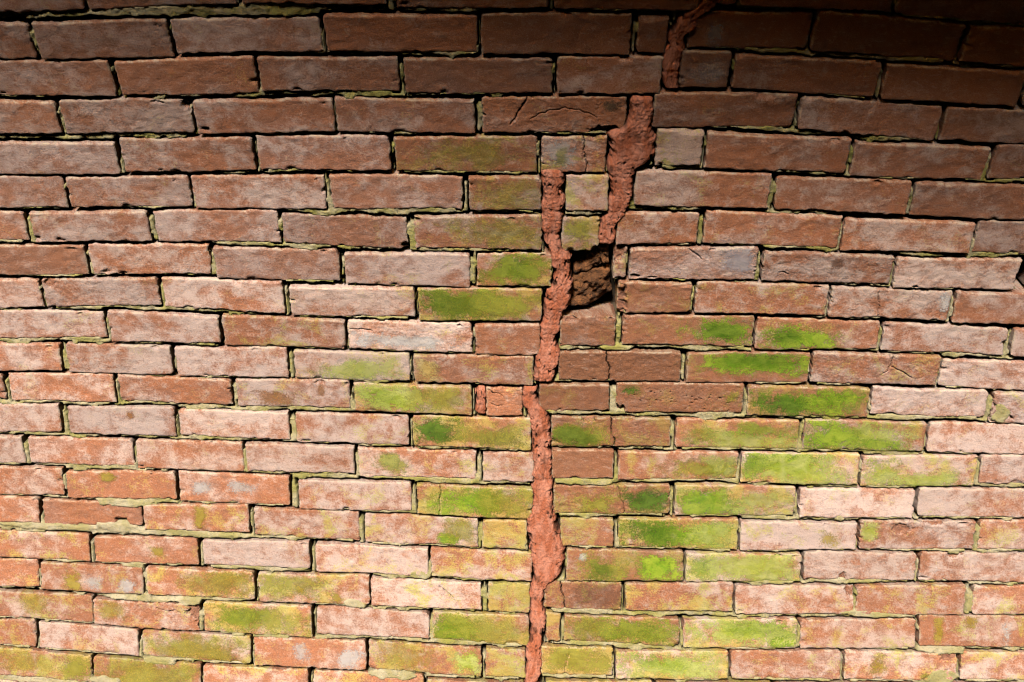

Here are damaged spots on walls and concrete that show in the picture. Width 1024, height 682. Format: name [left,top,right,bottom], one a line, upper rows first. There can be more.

crack [583,0,722,244]
spalling [561,243,627,321]
water stain [352,332,440,351]
crack [475,384,493,414]
crack [522,168,573,682]
water stain [339,651,361,667]